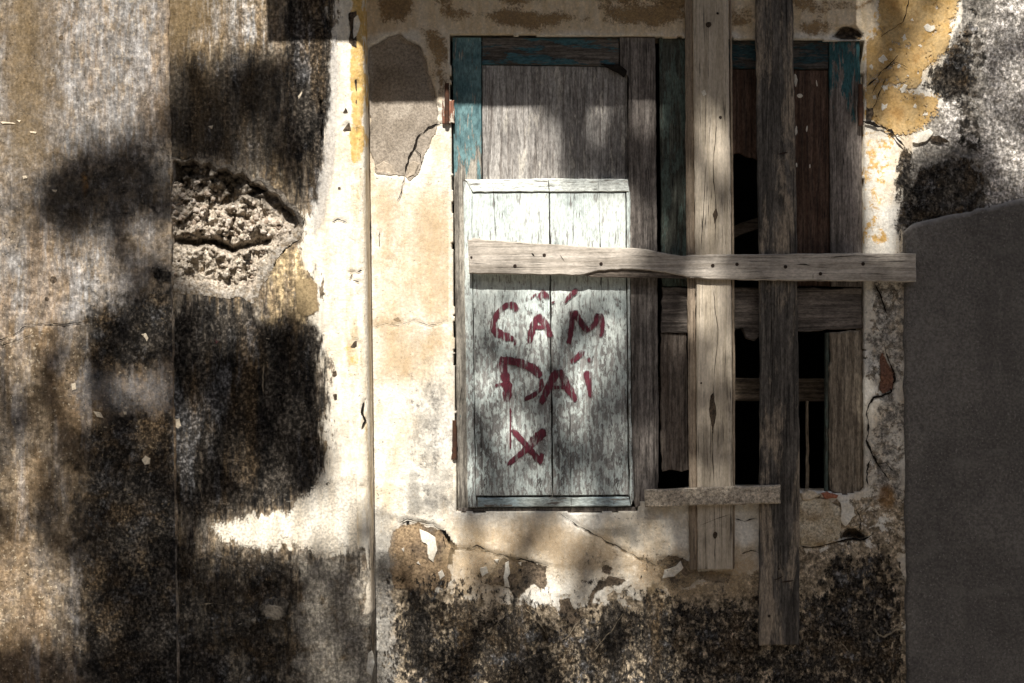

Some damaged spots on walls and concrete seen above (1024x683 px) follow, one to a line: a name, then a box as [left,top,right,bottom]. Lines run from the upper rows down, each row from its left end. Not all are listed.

flaking render [343,0,448,180]
peeling [793,0,960,144]
crack [863,0,909,147]
leakage [921,24,982,98]
spalling [149,157,303,303]
crack [398,124,440,199]
leakage [894,147,993,253]
crack [866,345,896,484]
flaking render [388,522,452,597]
flaking render [480,557,547,597]
crack [558,512,687,580]
leakage [375,531,901,683]